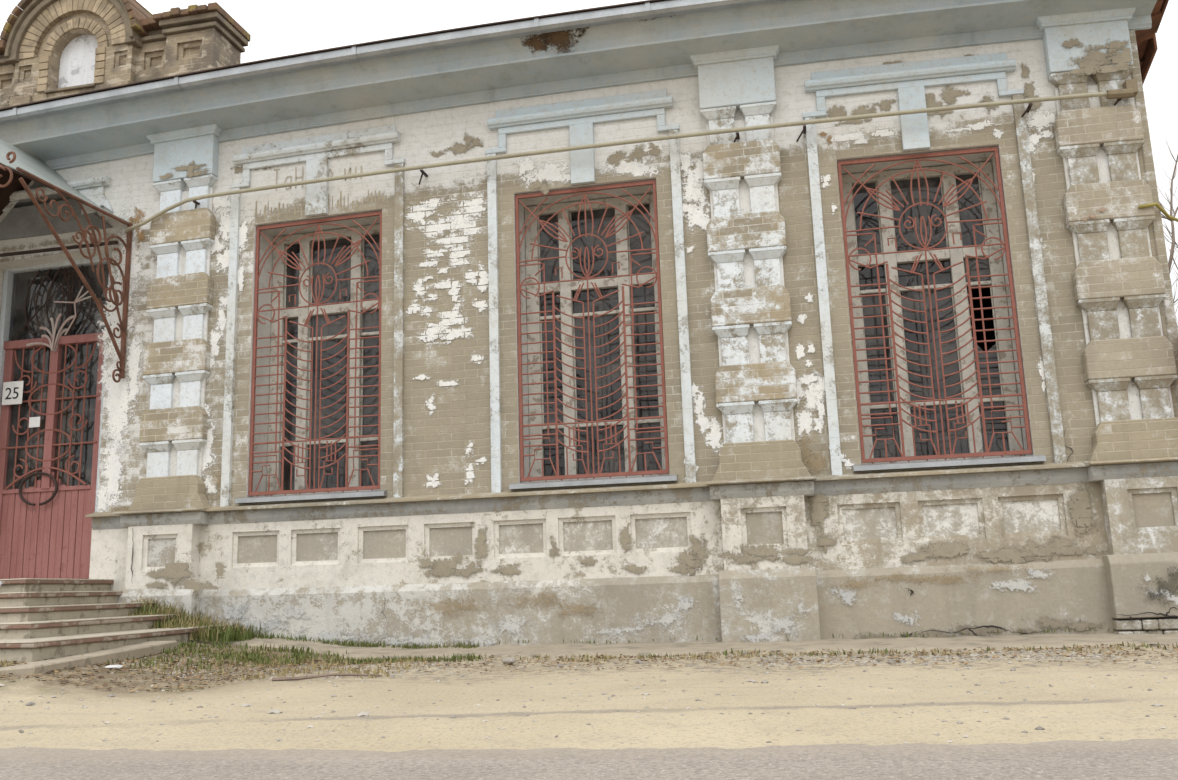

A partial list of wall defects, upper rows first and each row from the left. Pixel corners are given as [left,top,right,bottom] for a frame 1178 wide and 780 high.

peeling [1062,38,1138,75]
peeling [823,99,898,147]
peeling [925,85,1004,138]
peeling [430,134,483,157]
peeling [405,191,489,364]
peeling [413,374,458,415]
peeling [424,473,441,489]
peeling [463,440,487,484]
peeling [900,482,1101,564]
peeling [619,525,647,574]
peeling [146,563,227,593]
water stain [1144,574,1178,605]